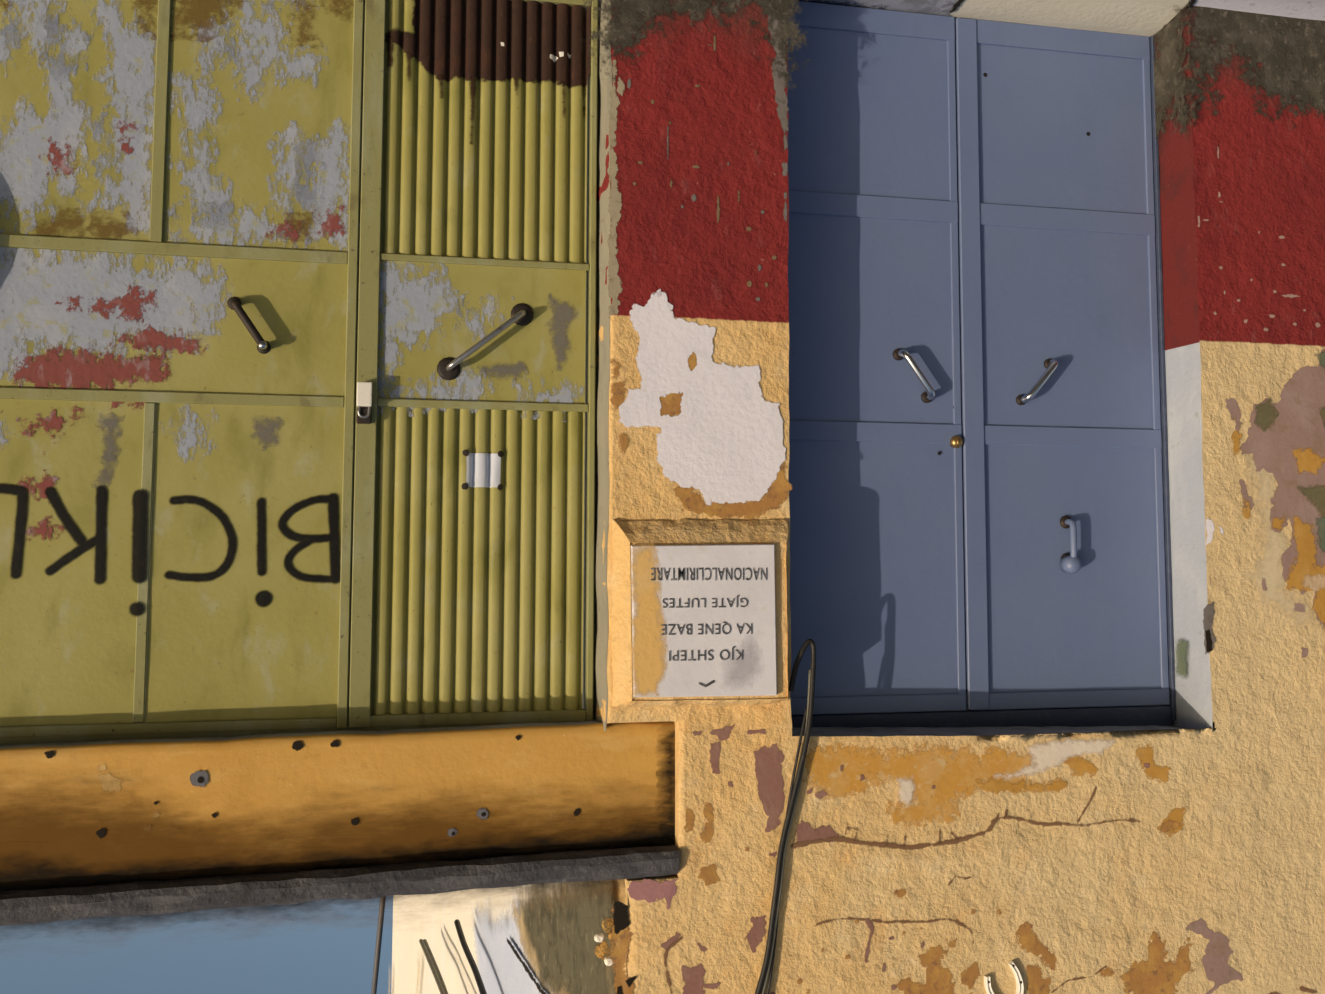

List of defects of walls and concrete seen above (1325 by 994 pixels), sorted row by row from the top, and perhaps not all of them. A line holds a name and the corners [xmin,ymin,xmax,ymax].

rust [385,0,591,144]
damp [582,0,809,87]
damp [1153,6,1325,140]
peeling [0,0,360,387]
peeling [377,262,514,419]
peeling [1225,349,1325,628]
damp [0,731,675,891]
peeling [692,725,785,832]
crack [791,786,1140,850]
crack [815,917,974,963]
crack [1051,965,1107,993]
peeling [1100,919,1244,994]